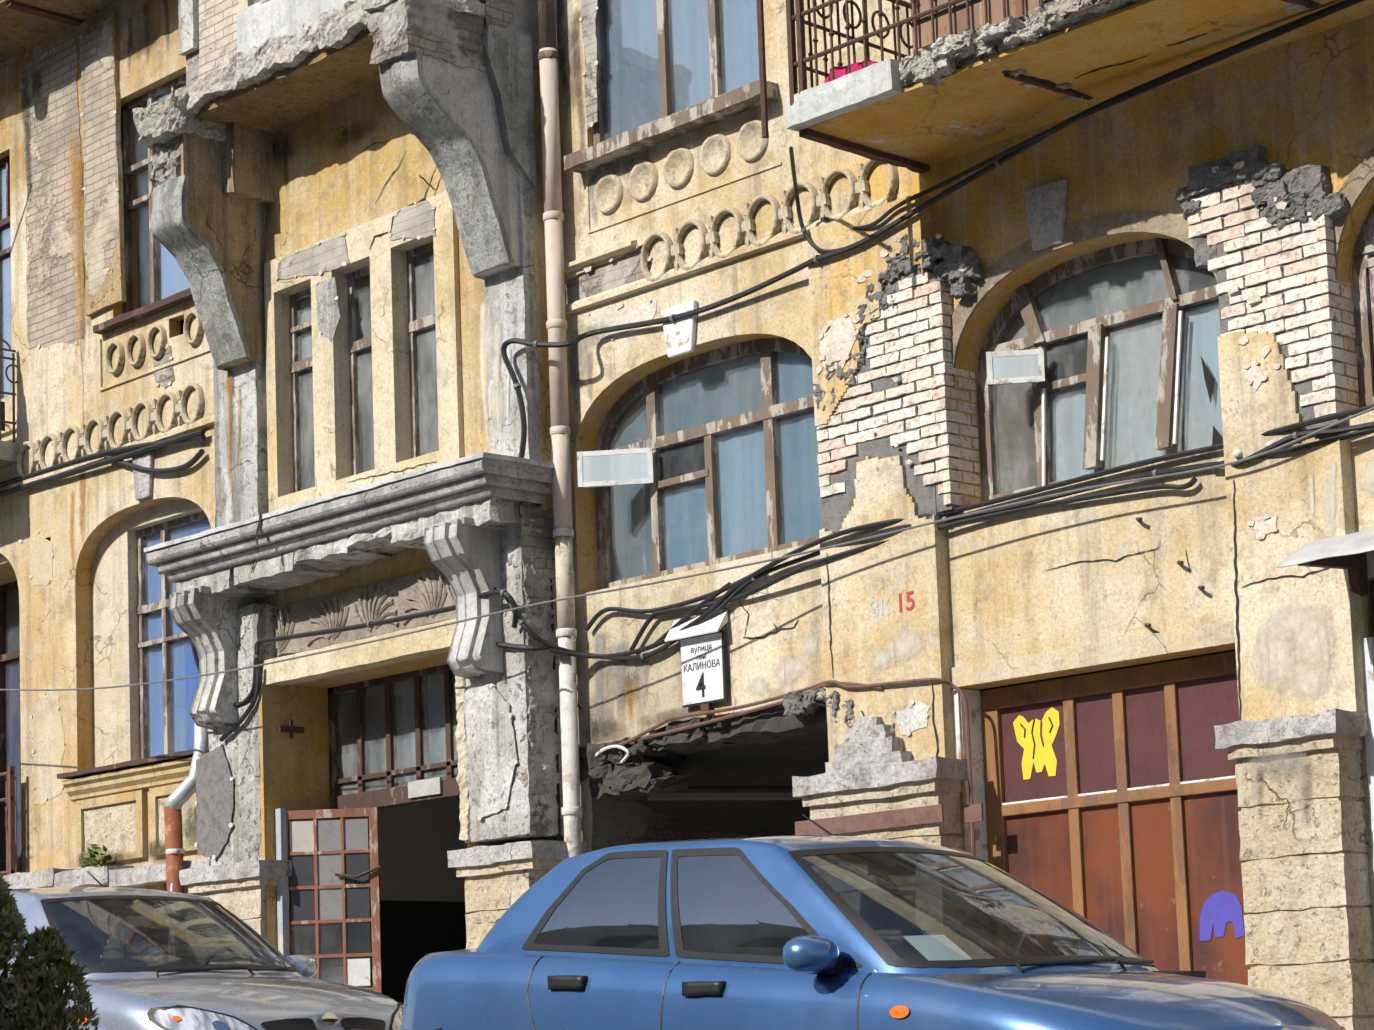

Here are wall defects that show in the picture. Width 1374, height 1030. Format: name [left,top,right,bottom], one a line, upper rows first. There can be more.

spalling [899,0,1132,87]
spalling [1001,68,1094,102]
spalling [1281,0,1321,13]
flaking render [20,0,486,349]
flaking render [1174,160,1359,418]
flaking render [812,234,983,513]
spalling [1212,426,1223,445]
crack [1045,547,1189,571]
crack [1233,480,1327,721]
flaking render [455,502,564,843]
flaking render [579,716,737,794]
peeling [891,699,931,736]